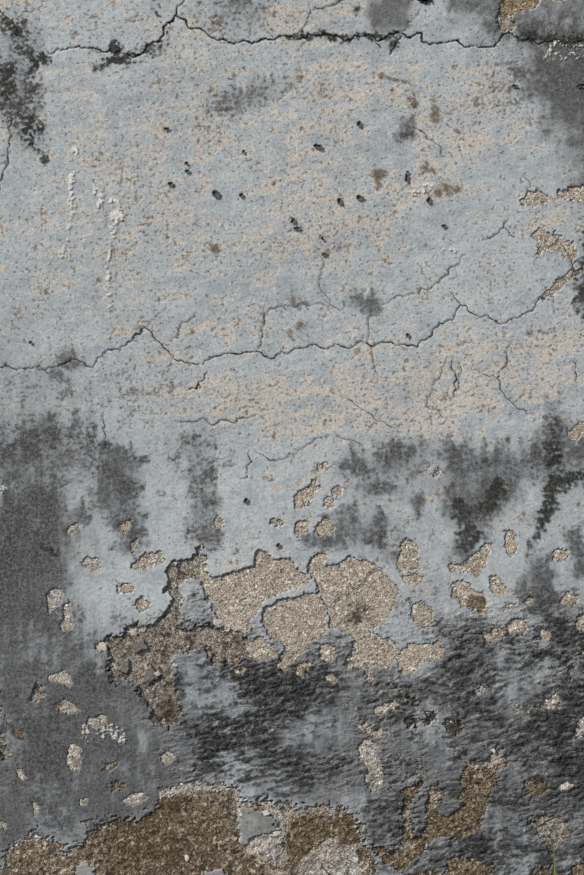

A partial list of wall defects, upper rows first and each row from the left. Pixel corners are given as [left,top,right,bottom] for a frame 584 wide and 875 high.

crack [48,0,581,58]
water stain [285,0,411,53]
mould [0,17,52,166]
crack [0,120,40,181]
crack [1,237,576,422]
crack [177,415,253,426]
water stain [68,440,149,555]
flaking render [95,519,443,730]
flaking render [448,529,517,613]
water stain [515,415,584,686]
flaking render [356,696,417,792]
flaking render [0,743,508,875]